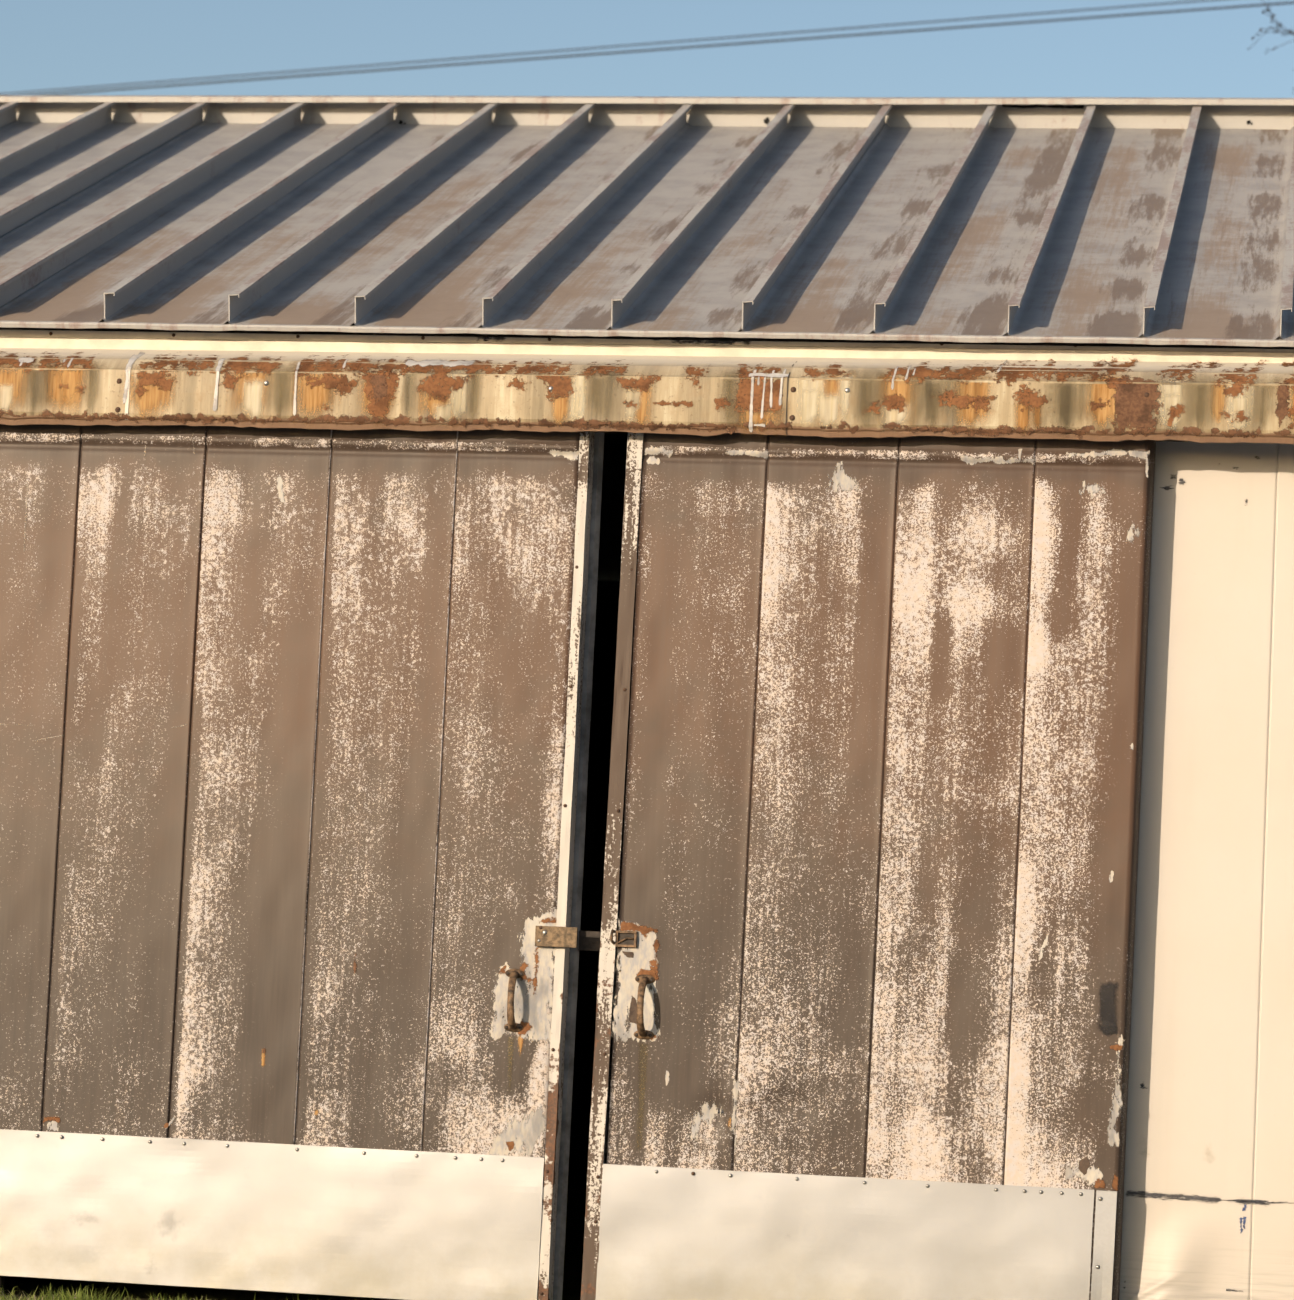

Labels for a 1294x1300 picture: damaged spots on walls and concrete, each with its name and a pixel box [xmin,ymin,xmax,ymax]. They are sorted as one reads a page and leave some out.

rust [0,351,793,435]
rust [804,356,1294,439]
peeling [549,449,579,461]
peeling [645,445,673,465]
peeling [725,449,768,459]
peeling [826,461,859,492]
peeling [1066,448,1150,477]
peeling [489,908,557,1052]
peeling [612,921,661,1042]
peeling [687,1080,740,1150]
peeling [1107,1034,1124,1147]
peeling [1065,1157,1118,1191]